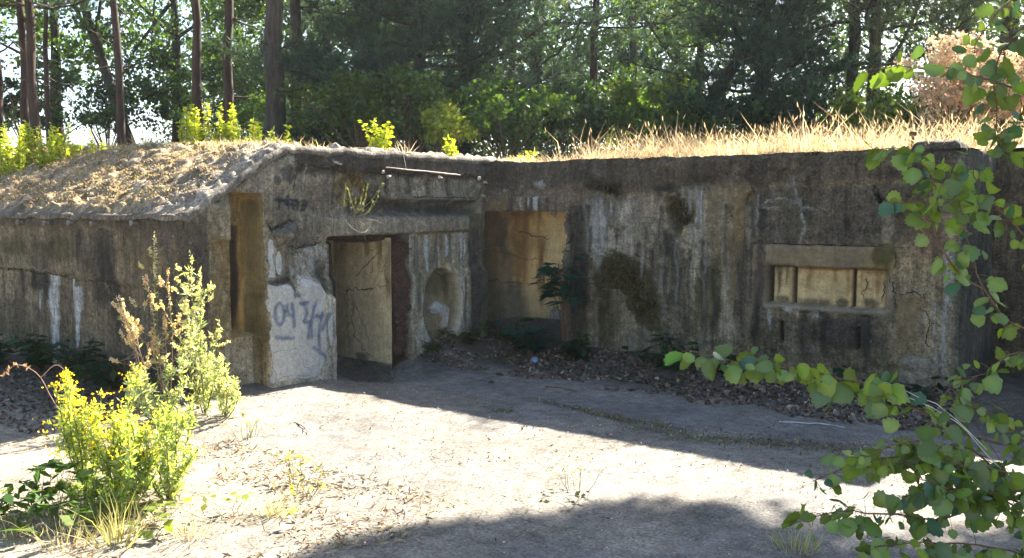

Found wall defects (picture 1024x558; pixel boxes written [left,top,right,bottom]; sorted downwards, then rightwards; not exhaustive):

efflorescence [73,279,82,347]
crack [342,244,390,364]
damp [570,199,632,333]
damp [641,188,788,338]
crack [584,178,939,350]